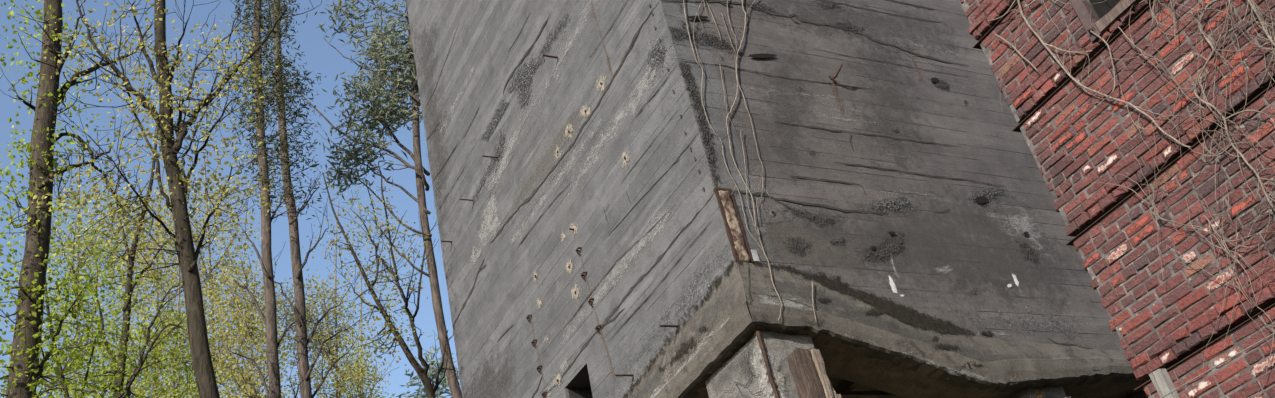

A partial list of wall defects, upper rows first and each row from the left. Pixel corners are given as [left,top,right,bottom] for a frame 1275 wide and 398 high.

spalling [751,345,786,398]